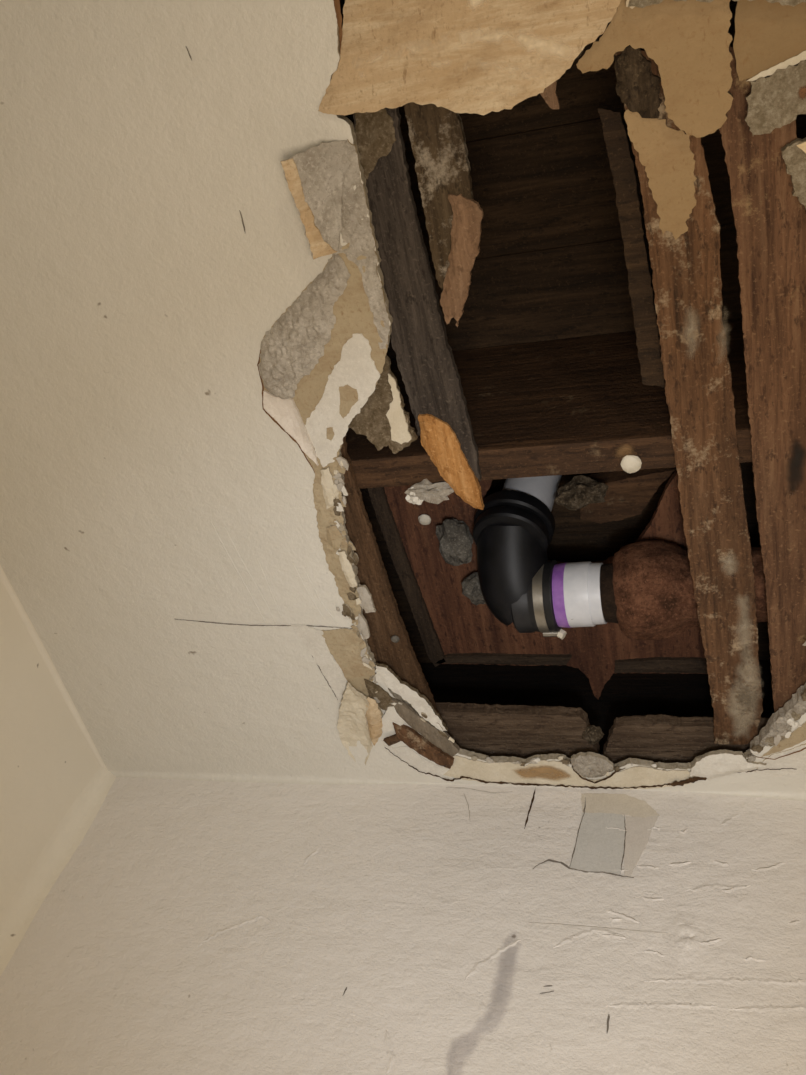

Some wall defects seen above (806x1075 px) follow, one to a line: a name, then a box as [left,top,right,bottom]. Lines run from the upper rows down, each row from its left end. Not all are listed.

crack [176,619,353,629]
peeling [258,139,806,877]